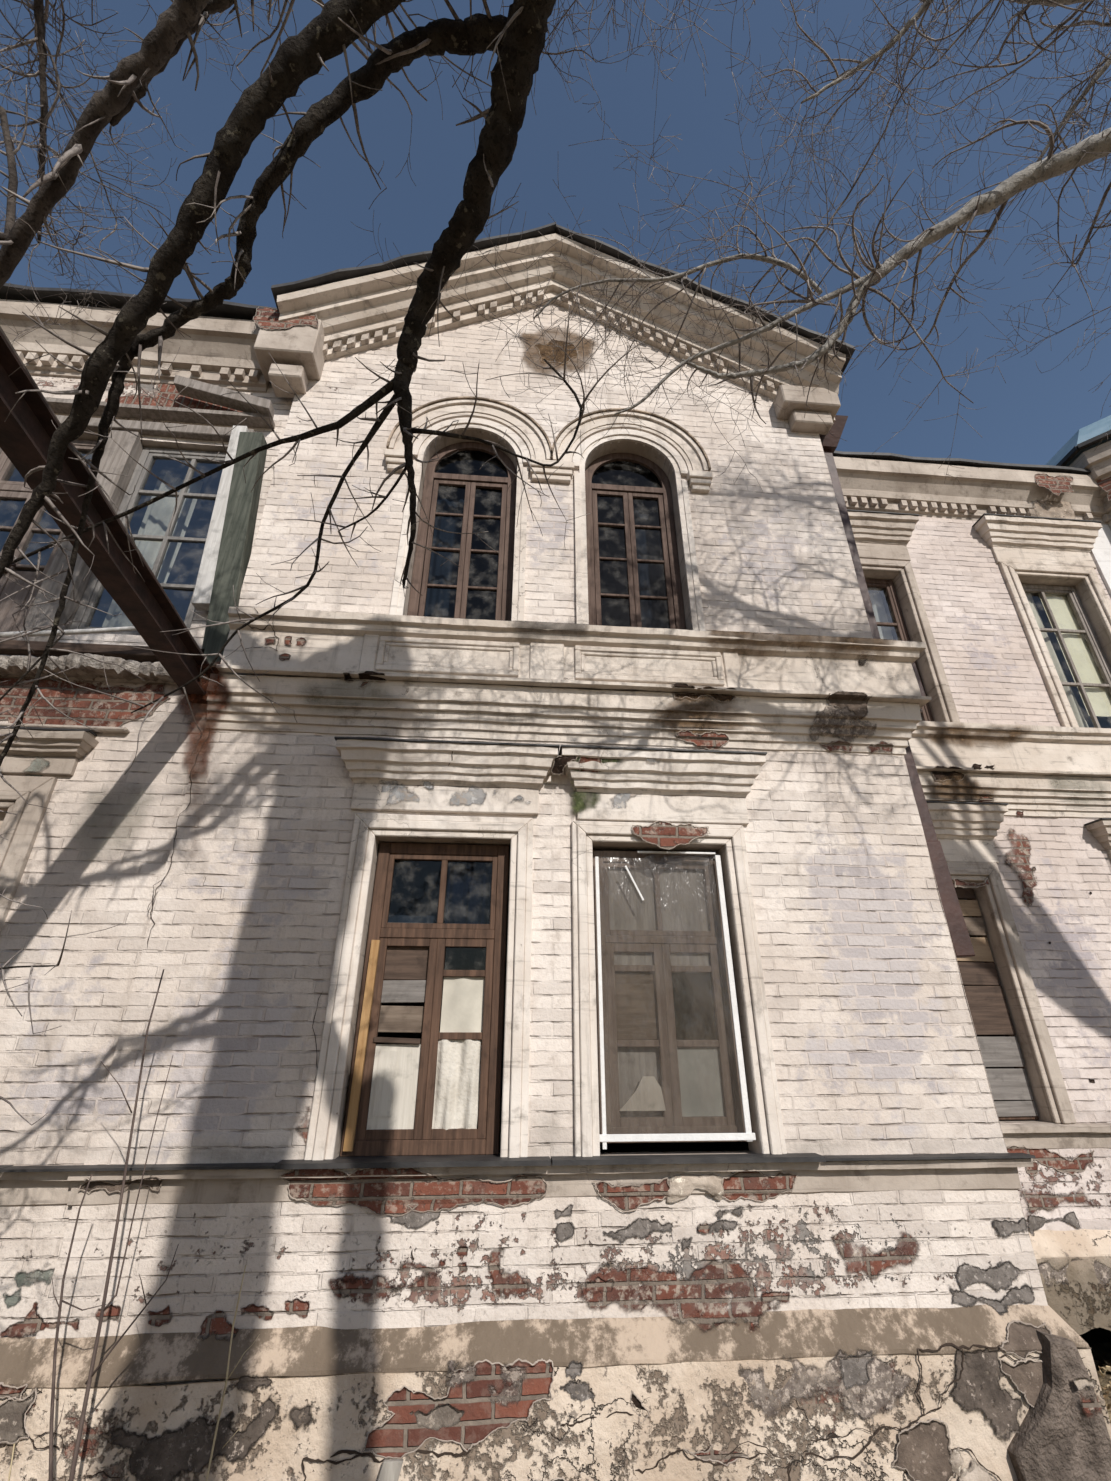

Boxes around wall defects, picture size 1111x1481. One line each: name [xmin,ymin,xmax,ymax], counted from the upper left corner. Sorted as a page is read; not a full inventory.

rust [177,664,230,777]
flaking render [278,1168,575,1242]
flaking render [593,1169,798,1250]
peeling [993,1145,1094,1238]
flaking render [0,1268,121,1338]
peeling [580,1259,790,1332]
spalling [949,1258,1111,1441]
crack [0,1432,120,1479]
peeling [102,1375,314,1481]
crack [302,1449,471,1481]
crack [561,1411,633,1427]
crack [635,1343,1042,1481]